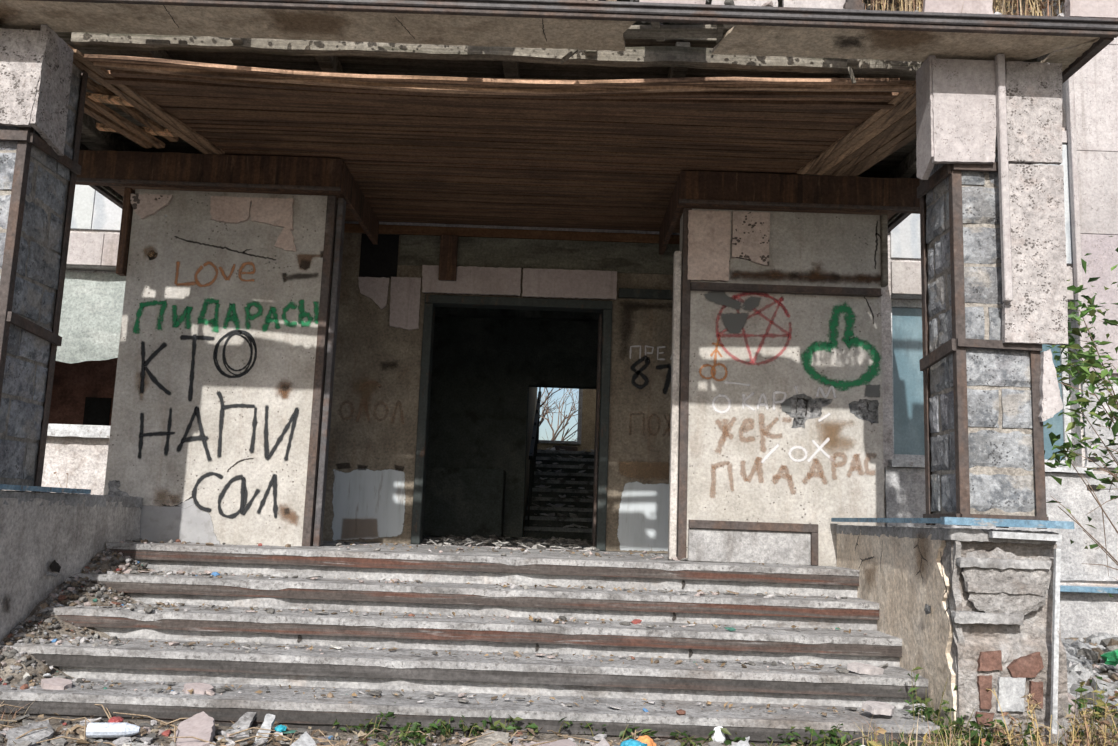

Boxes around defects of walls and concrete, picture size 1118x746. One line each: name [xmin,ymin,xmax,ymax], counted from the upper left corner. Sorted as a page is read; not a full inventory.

spalling [144,248,158,260]
spalling [781,394,833,428]
spalling [849,385,880,423]
crack [855,536,882,568]